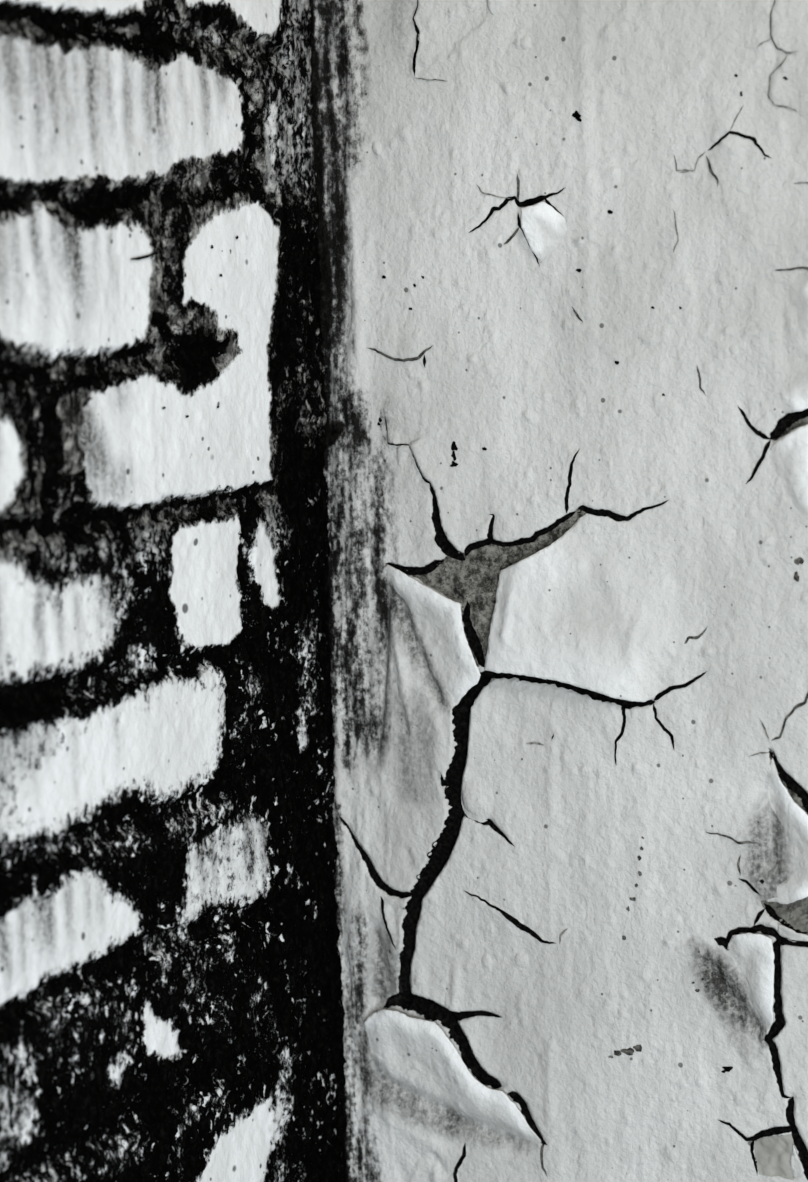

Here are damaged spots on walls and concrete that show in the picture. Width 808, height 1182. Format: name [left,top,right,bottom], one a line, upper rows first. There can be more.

crack [413,0,444,81]
crack [674,0,798,187]
peeling [521,202,567,262]
peeling [769,271,808,520]
crack [385,417,668,575]
peeling [384,509,704,708]
crack [751,693,808,814]
crack [339,601,707,1176]
peeling [727,748,808,1034]
peeling [364,1009,542,1145]
crack [706,832,808,1180]
peeling [754,1134,804,1180]